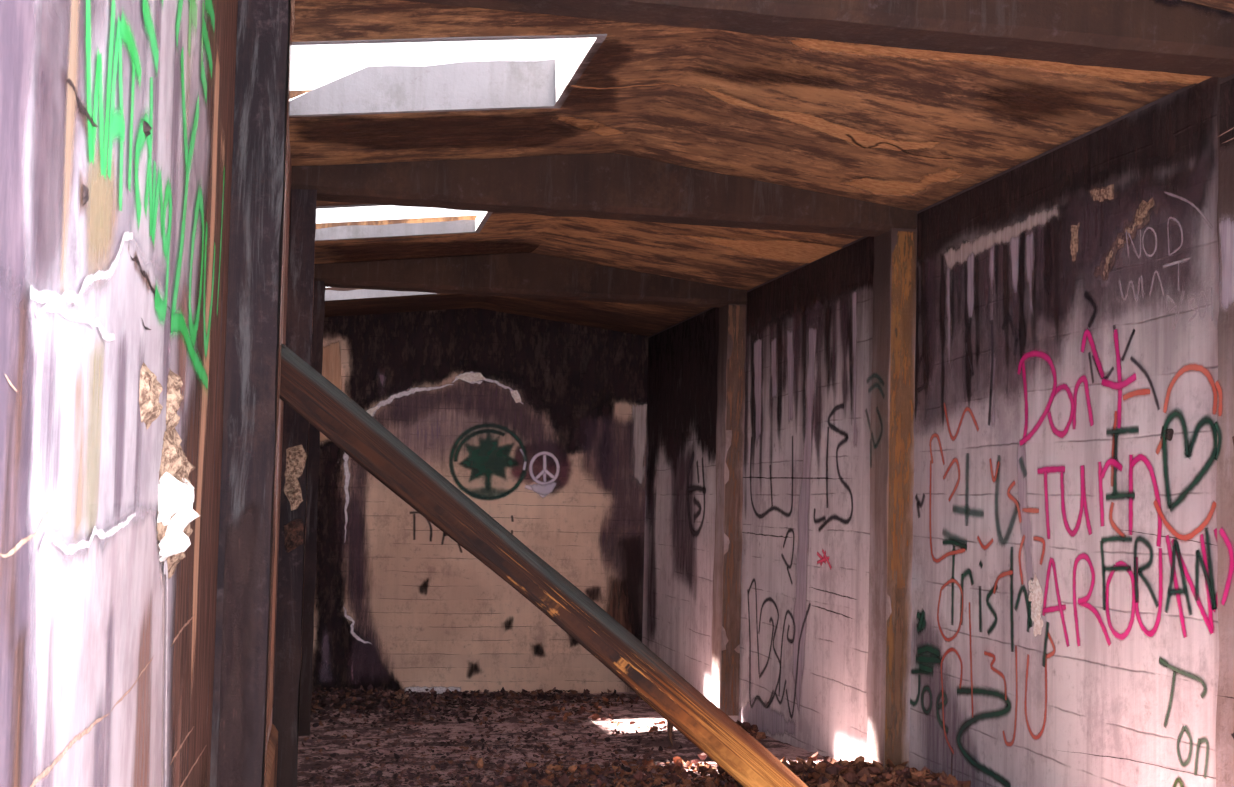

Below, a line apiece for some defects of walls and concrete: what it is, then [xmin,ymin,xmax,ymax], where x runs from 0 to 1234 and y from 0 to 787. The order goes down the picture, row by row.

leakage [283,40,680,346]
leakage [686,235,841,263]
leakage [700,68,961,196]
leakage [915,208,1059,423]
peeling [26,232,200,787]
leakage [268,401,284,729]
spalling [284,445,307,553]
leakage [585,587,600,601]
leakage [647,483,656,639]
leakage [672,443,696,596]
leakage [739,293,857,735]
leakage [404,663,480,694]